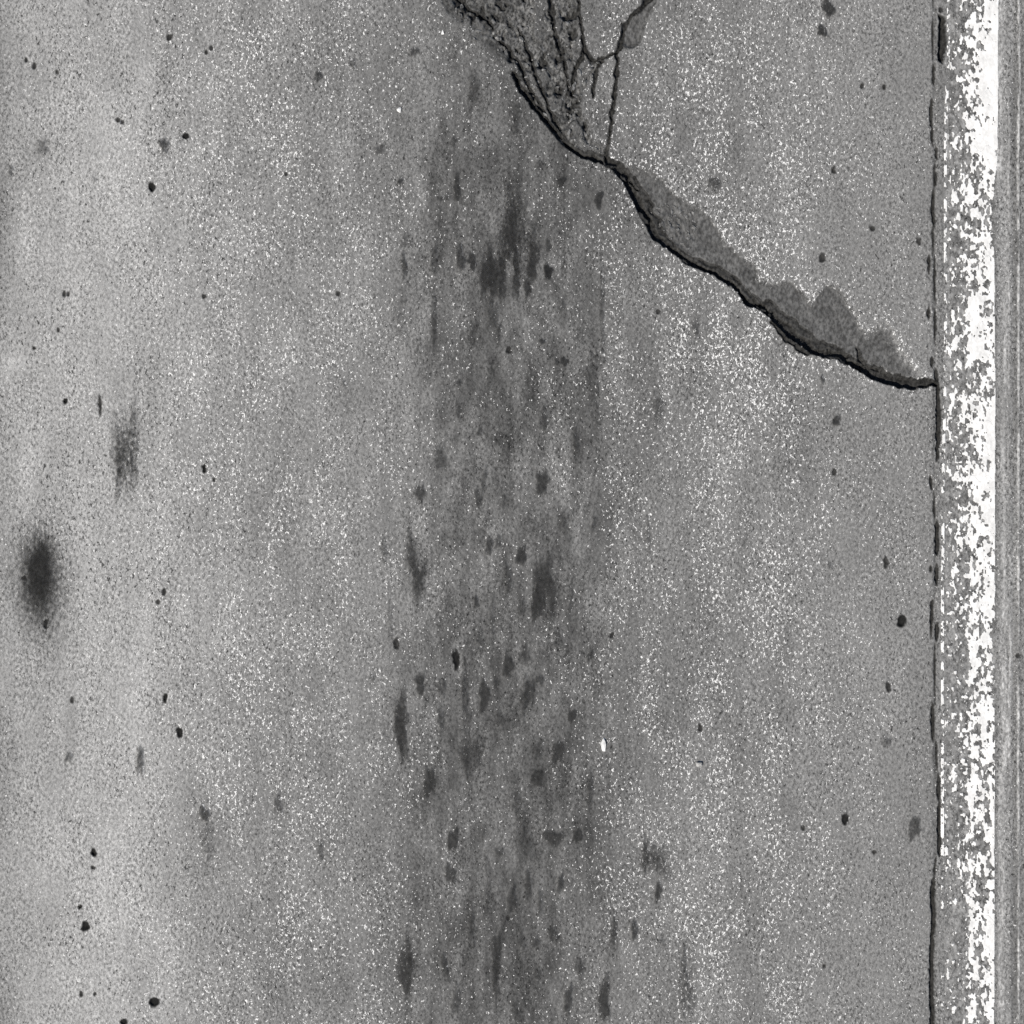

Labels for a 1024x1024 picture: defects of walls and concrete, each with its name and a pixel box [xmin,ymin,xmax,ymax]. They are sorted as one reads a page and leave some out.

spalling [622,0,657,49]
spalling [443,0,605,155]
leakage [480,209,531,297]
spalling [627,166,909,375]
leakage [407,536,415,567]
crack [457,0,941,1024]
peeling [937,8,999,1024]
leakage [532,587,555,619]
leakage [395,717,403,753]